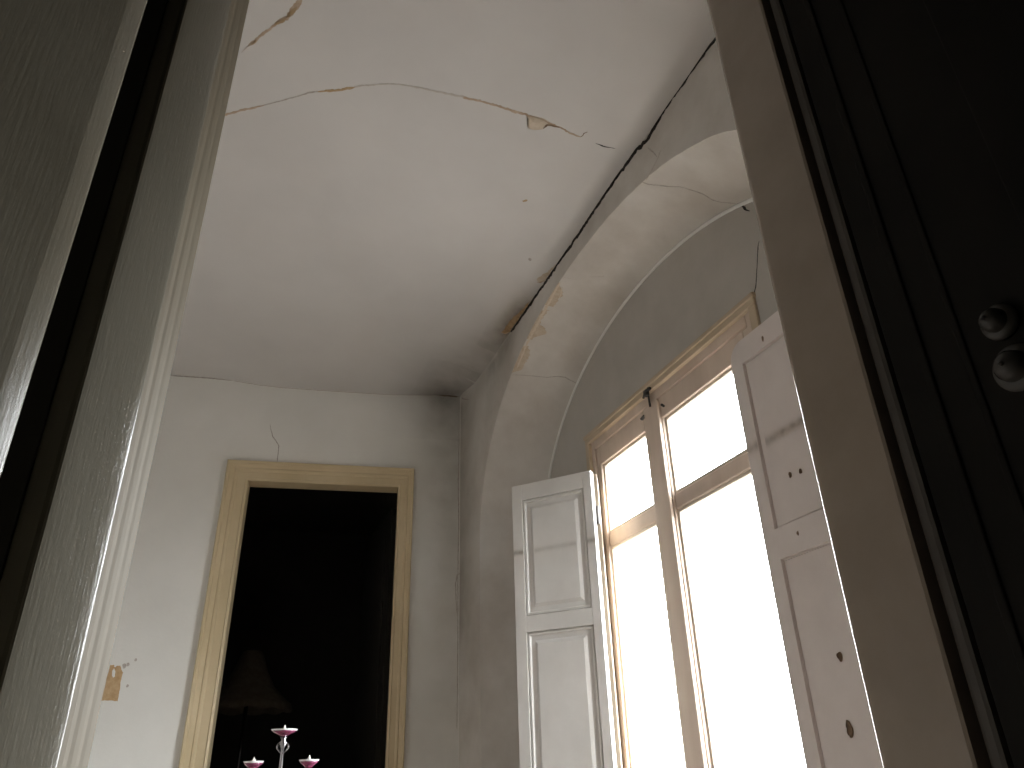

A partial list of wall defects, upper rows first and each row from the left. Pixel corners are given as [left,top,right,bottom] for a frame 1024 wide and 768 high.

crack [241,0,302,53]
crack [225,38,749,349]
spalling [512,265,563,373]
peeling [102,658,137,701]